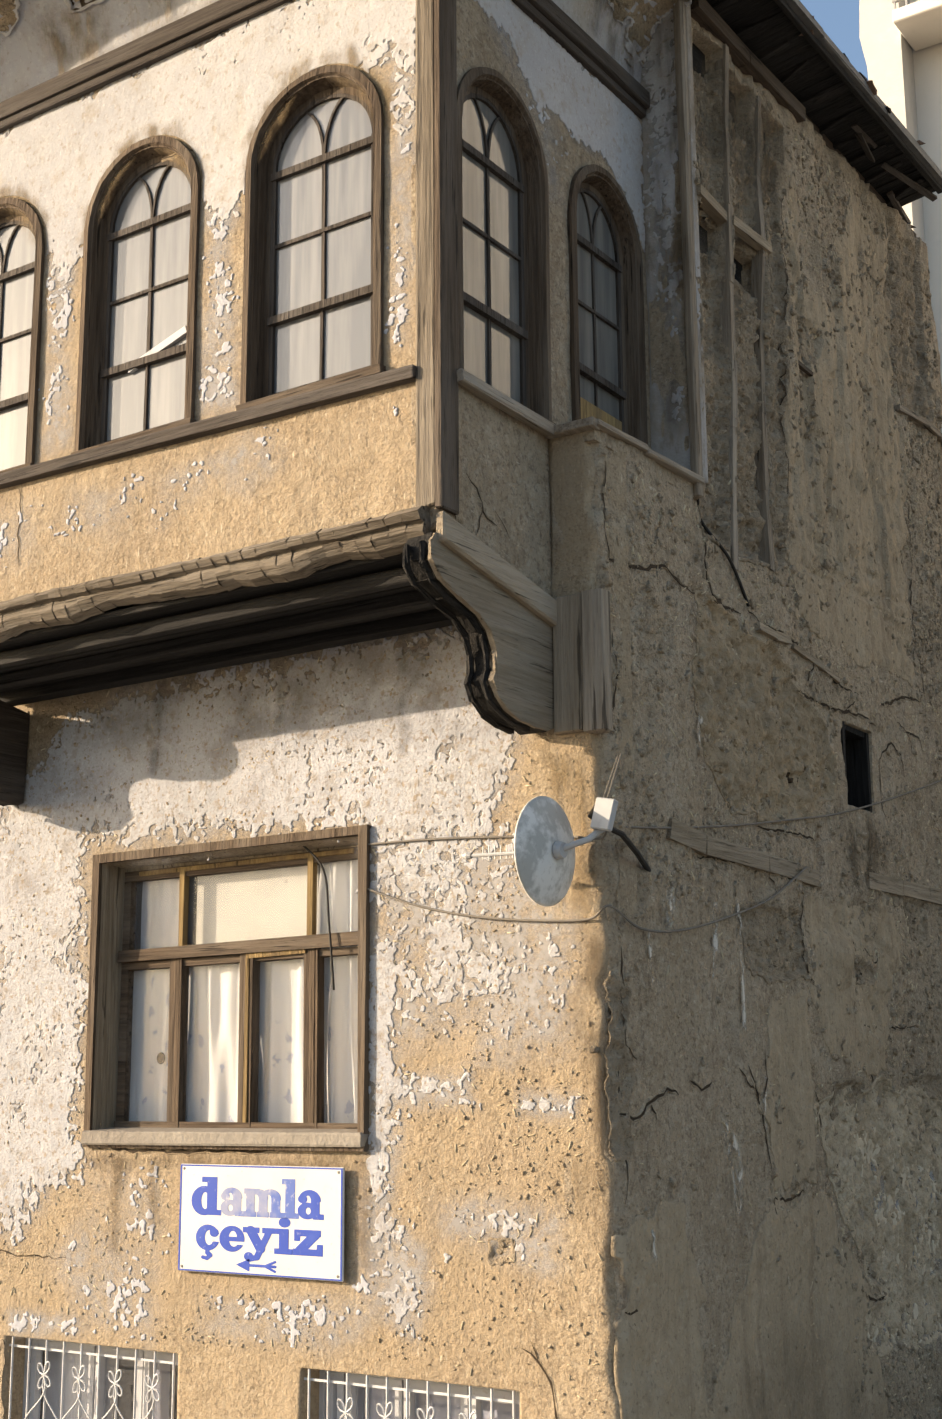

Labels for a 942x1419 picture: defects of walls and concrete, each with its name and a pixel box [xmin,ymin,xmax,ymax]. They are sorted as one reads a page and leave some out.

peeling [0,0,416,441]
peeling [0,504,43,568]
peeling [48,461,209,537]
crack [602,461,926,822]
peeling [0,626,582,1348]
crack [616,947,804,1215]
crack [814,1091,879,1169]
crack [0,1248,71,1261]
peeling [0,1250,152,1419]
crack [522,1342,559,1419]